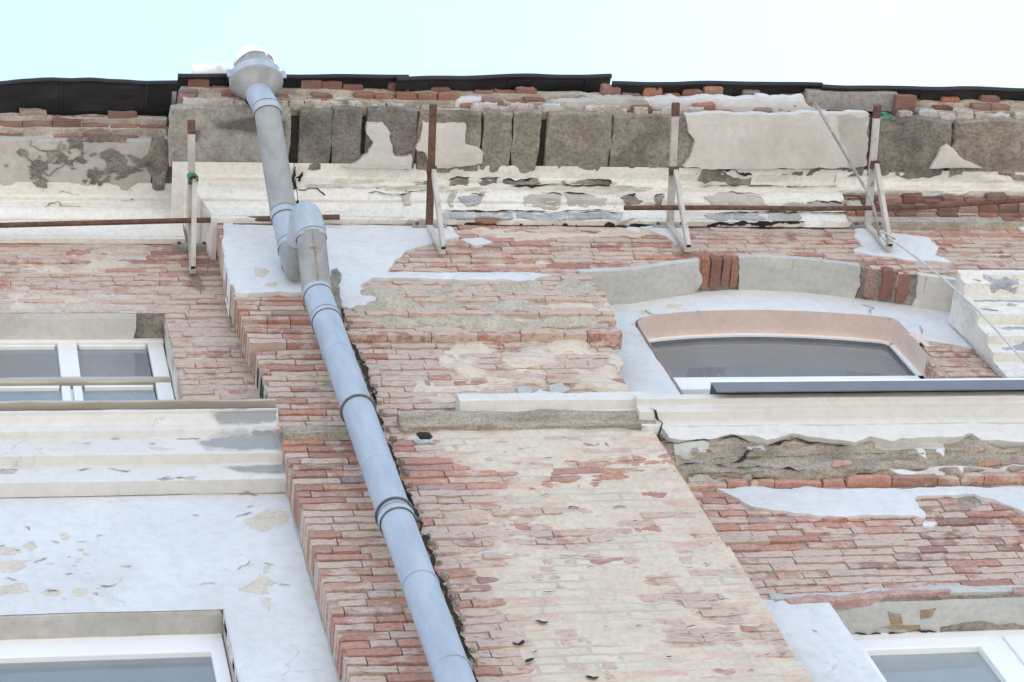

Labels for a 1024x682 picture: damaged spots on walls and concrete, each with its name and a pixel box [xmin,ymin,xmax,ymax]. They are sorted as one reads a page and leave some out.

spalling [17,135,169,188]
flaking render [930,144,982,169]
flaking render [325,121,693,309]
flaking render [222,223,302,318]
peeling [973,274,1024,310]
spalling [383,339,1024,528]
crack [651,408,845,471]
crack [330,268,478,682]
peeling [237,491,290,532]
peeling [0,526,116,599]
peeling [224,554,288,611]
spalling [769,585,1024,635]